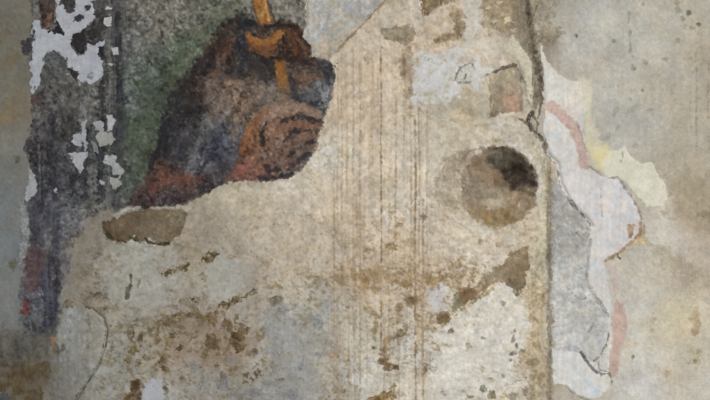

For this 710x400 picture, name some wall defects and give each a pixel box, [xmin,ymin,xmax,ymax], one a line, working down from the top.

peeling [20,0,119,95]
peeling [68,99,124,190]
flaking render [482,63,529,119]
crack [518,0,583,217]
flaking render [102,204,192,247]
leakage [110,0,510,400]
crack [75,299,112,400]
leakage [84,291,122,313]